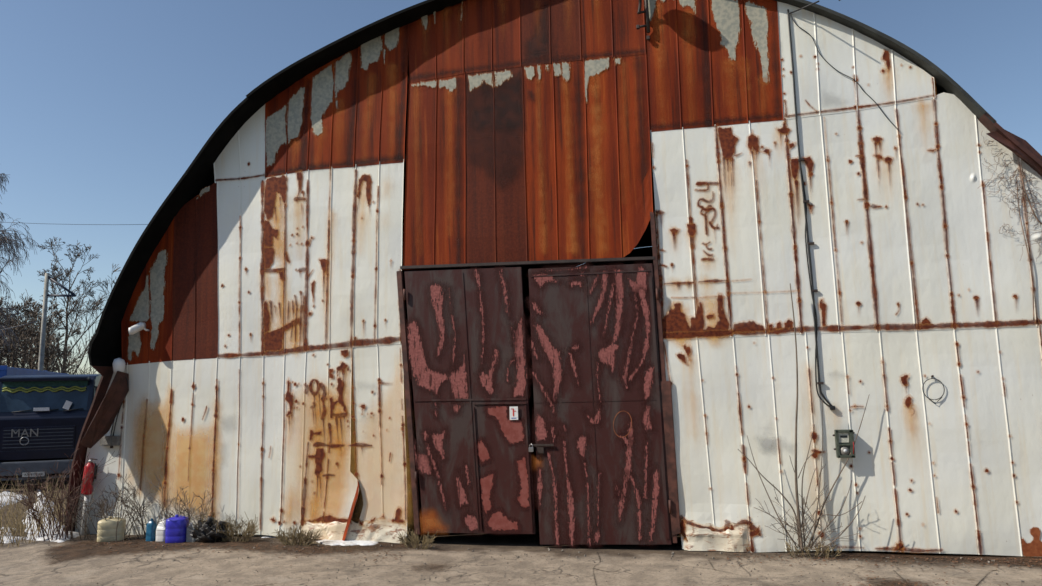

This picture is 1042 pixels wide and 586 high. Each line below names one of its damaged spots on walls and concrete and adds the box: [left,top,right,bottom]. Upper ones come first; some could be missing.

peeling [264,27,400,167]
peeling [411,61,571,92]
peeling [711,0,770,83]
peeling [127,249,168,361]
rust [215,48,645,530]
rust [655,56,1042,385]
peeling [407,268,601,546]
peeling [566,266,660,542]
rust [680,515,761,553]
rust [841,427,943,552]
rust [955,342,982,554]
rust [1021,527,1042,557]